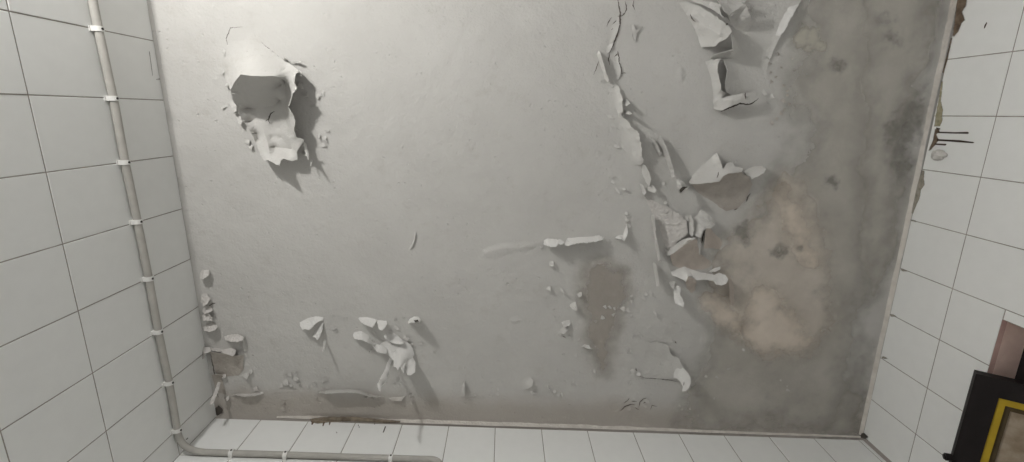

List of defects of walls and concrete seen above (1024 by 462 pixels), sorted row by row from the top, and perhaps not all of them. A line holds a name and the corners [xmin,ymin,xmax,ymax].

peeling [221,27,329,166]
crack [594,2,627,80]
peeling [679,0,801,112]
damp [934,81,943,126]
rust [929,127,974,150]
peeling [540,211,631,248]
peeling [596,50,766,320]
damp [688,0,936,438]
spalling [201,293,264,416]
peeling [300,311,437,401]
peeling [627,332,691,392]